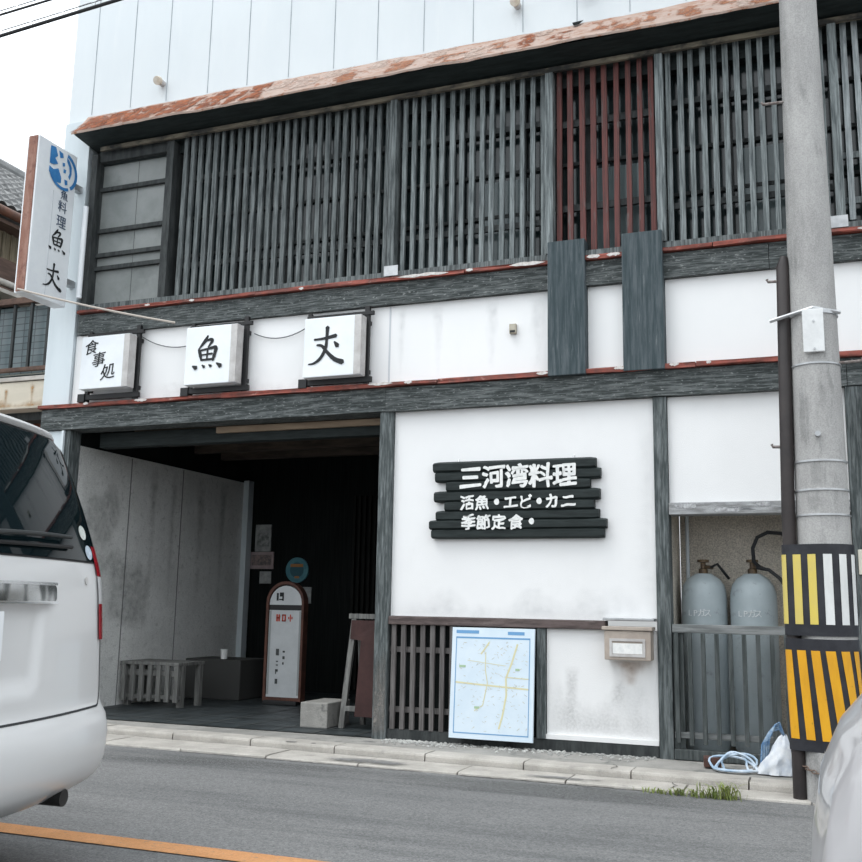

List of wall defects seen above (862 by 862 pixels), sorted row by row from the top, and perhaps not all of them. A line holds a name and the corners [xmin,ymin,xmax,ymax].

rust [678,5,701,16]
rust [591,11,658,31]
rust [518,34,536,48]
rust [385,59,415,72]
rust [72,82,273,132]